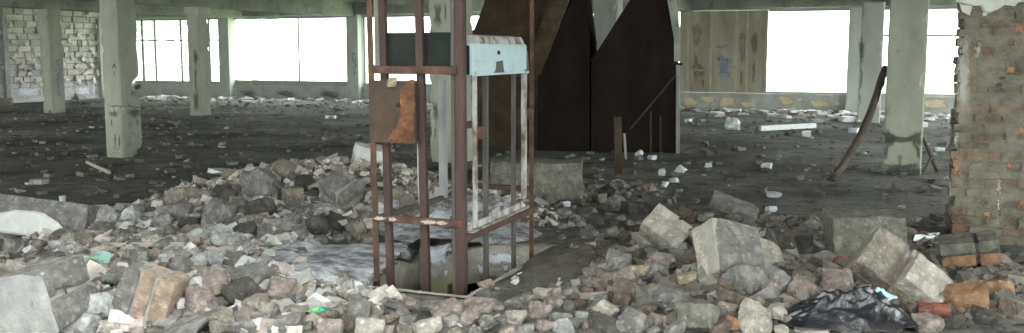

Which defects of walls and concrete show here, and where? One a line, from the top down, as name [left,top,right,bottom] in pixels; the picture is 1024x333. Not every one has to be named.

peeling [956,0,1024,46]
water stain [740,35,757,84]
peeling [959,60,969,103]